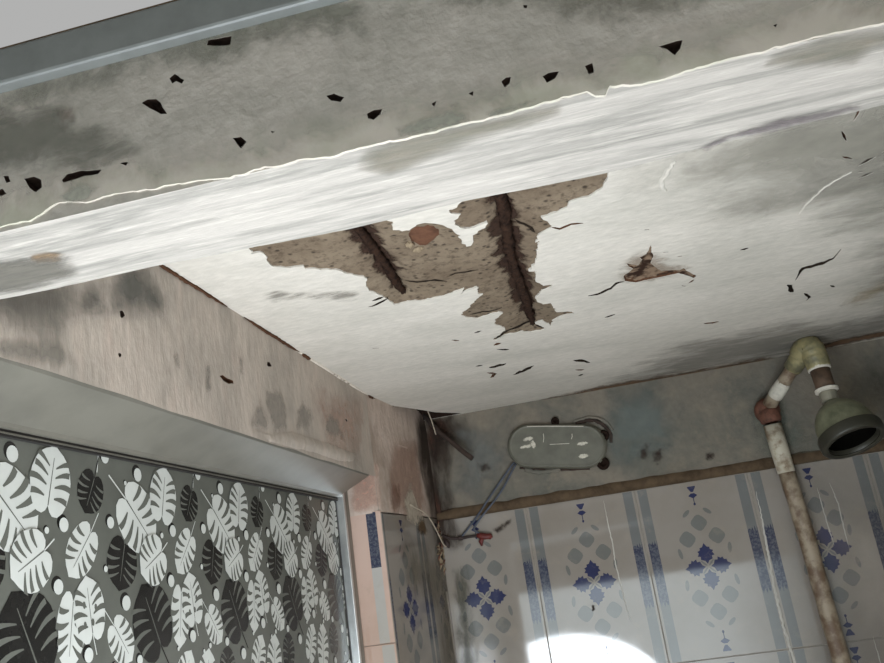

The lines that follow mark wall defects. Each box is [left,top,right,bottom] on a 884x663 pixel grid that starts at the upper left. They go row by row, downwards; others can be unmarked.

peeling [0,0,884,228]
crack [799,111,874,215]
crack [552,222,583,230]
water stain [0,260,72,324]
water stain [117,271,160,307]
spalling [249,173,608,350]
spalling [589,246,696,296]
crack [787,249,841,300]
water stain [2,343,65,364]
water stain [418,415,502,553]